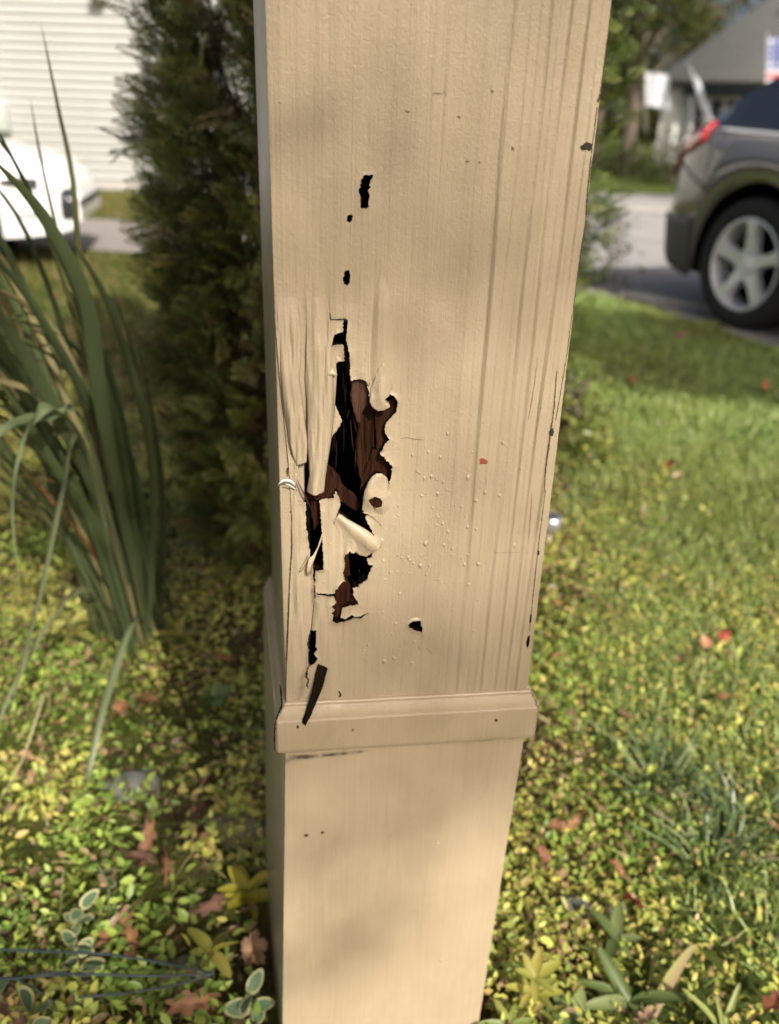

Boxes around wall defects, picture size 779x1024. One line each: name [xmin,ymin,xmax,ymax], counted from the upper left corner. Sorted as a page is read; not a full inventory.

peeling [277,296,350,501]
peeling [368,363,398,452]
peeling [307,465,392,623]
crack [273,508,315,751]
spalling [406,617,423,633]